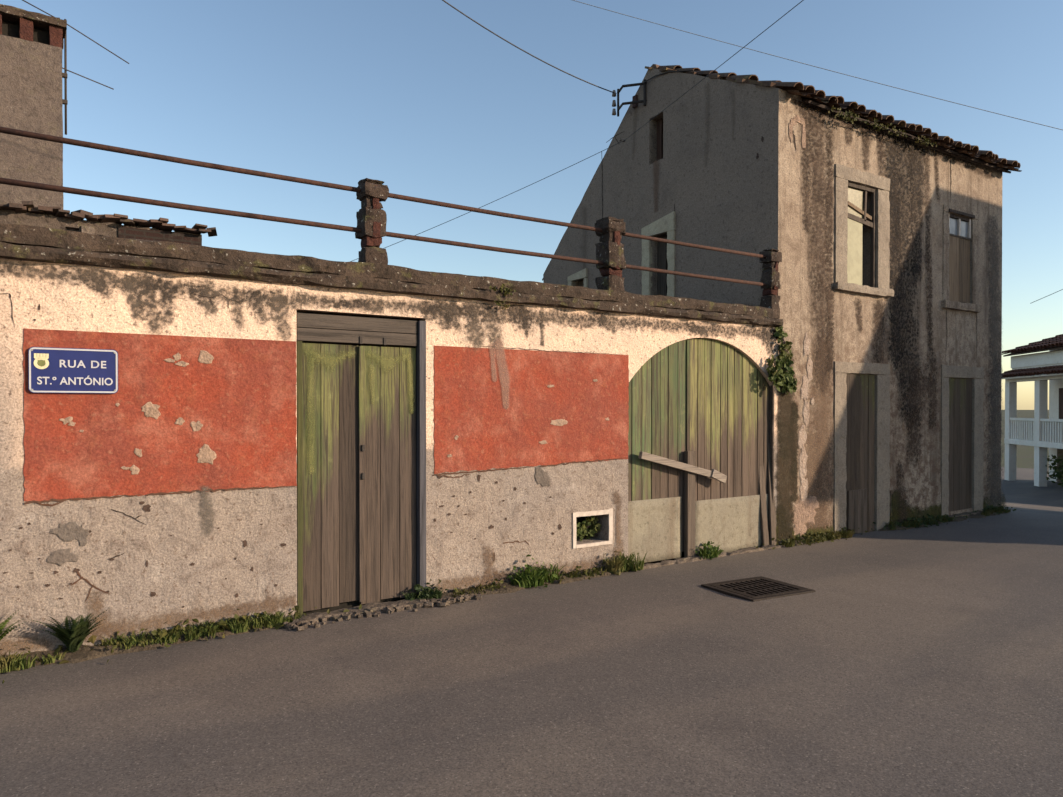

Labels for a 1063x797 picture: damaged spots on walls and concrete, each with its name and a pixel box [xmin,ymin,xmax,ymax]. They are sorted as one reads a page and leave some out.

water stain [0,99,992,542]
peeling [164,350,214,367]
water stain [986,218,1004,507]
peeling [142,402,161,419]
peeling [174,417,203,431]
peeling [120,448,142,475]
peeling [196,444,216,465]